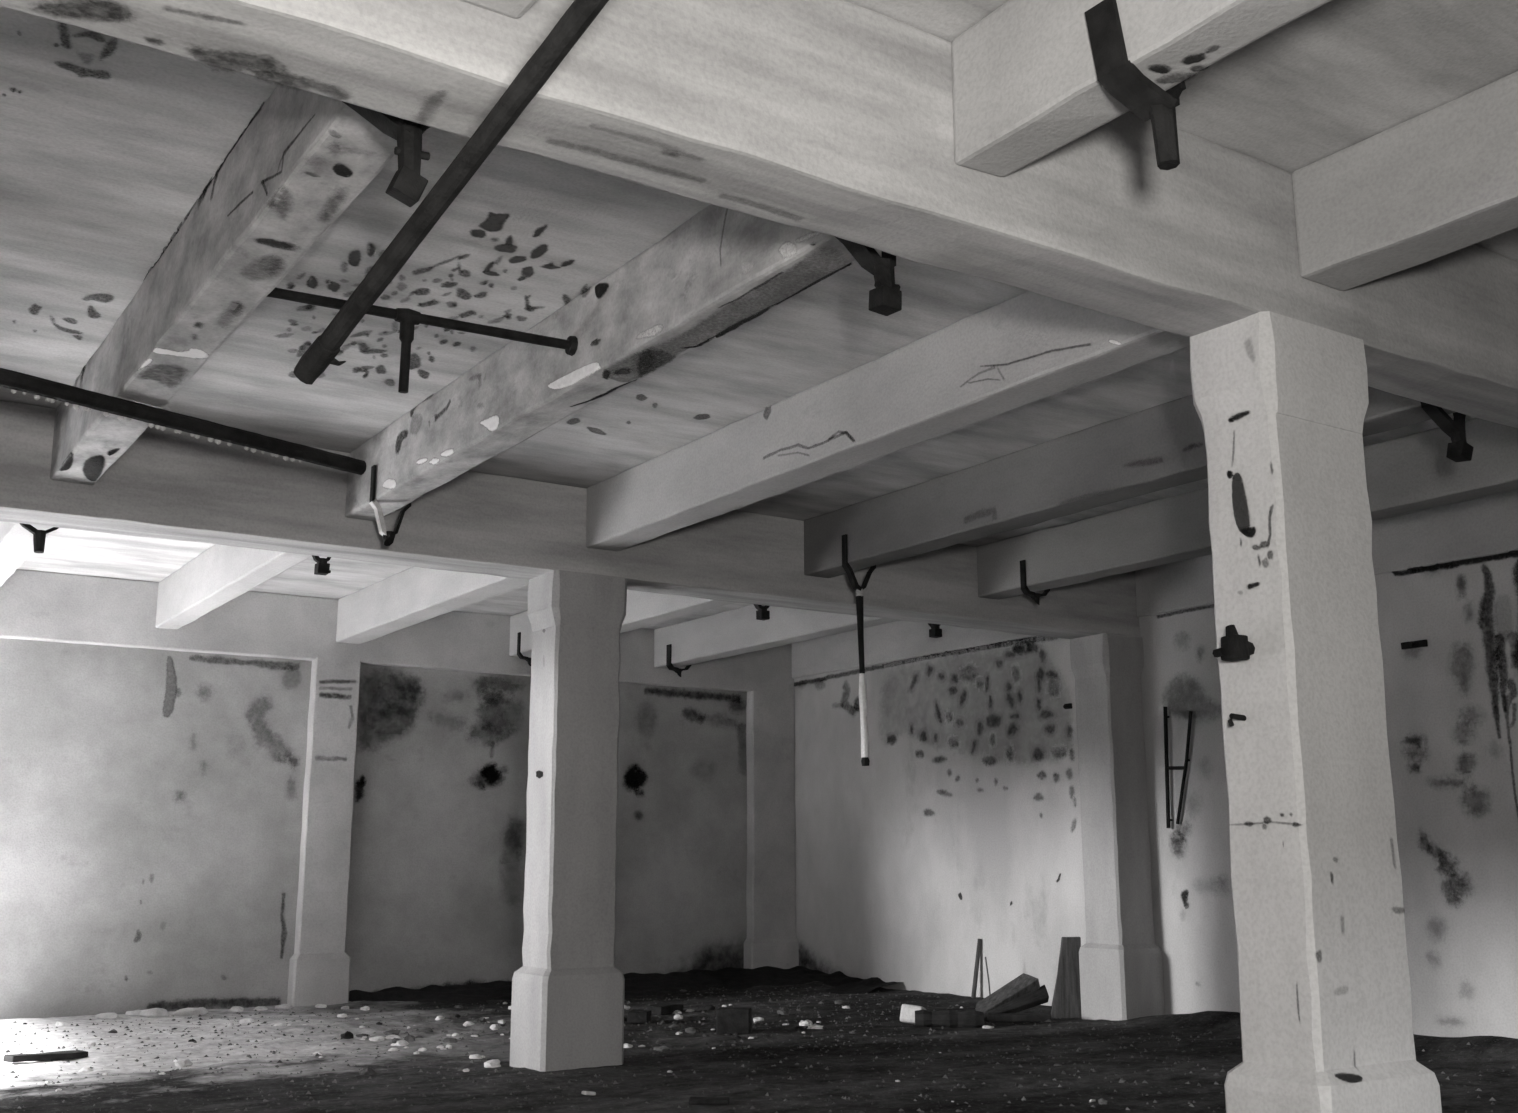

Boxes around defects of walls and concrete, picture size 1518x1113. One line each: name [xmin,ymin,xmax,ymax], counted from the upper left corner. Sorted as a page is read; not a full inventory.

peeling [55,22,117,79]
spalling [255,238,299,251]
peeling [289,244,385,378]
peeling [337,212,574,386]
spalling [562,283,609,304]
crack [979,344,1091,381]
water stain [360,674,418,746]
water stain [888,636,1070,794]
water stain [1478,565,1518,816]
water stain [1034,749,1076,827]
water stain [1421,835,1468,902]